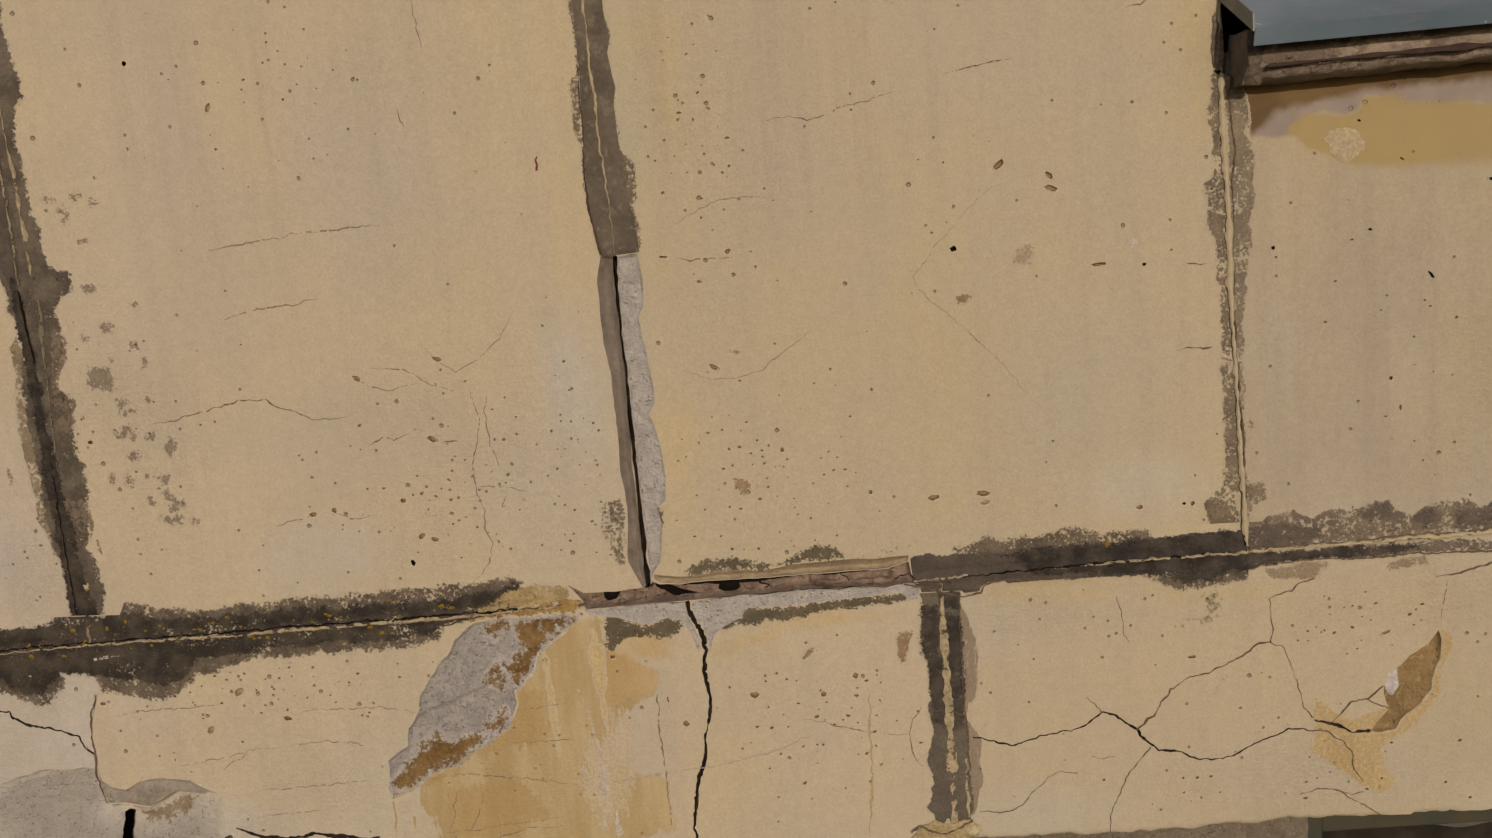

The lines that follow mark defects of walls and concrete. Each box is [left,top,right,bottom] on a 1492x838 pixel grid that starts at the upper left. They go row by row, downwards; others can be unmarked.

damp [1245,63,1492,188]
damp [77,300,203,530]
crack [352,368,522,580]
crack [442,256,918,838]
peeling [387,0,993,838]
damp [682,522,1252,635]
crack [0,694,108,803]
spalling [0,768,240,838]
crack [234,828,380,838]
damp [0,567,685,838]
crack [805,550,1492,832]
spalling [1314,630,1441,781]